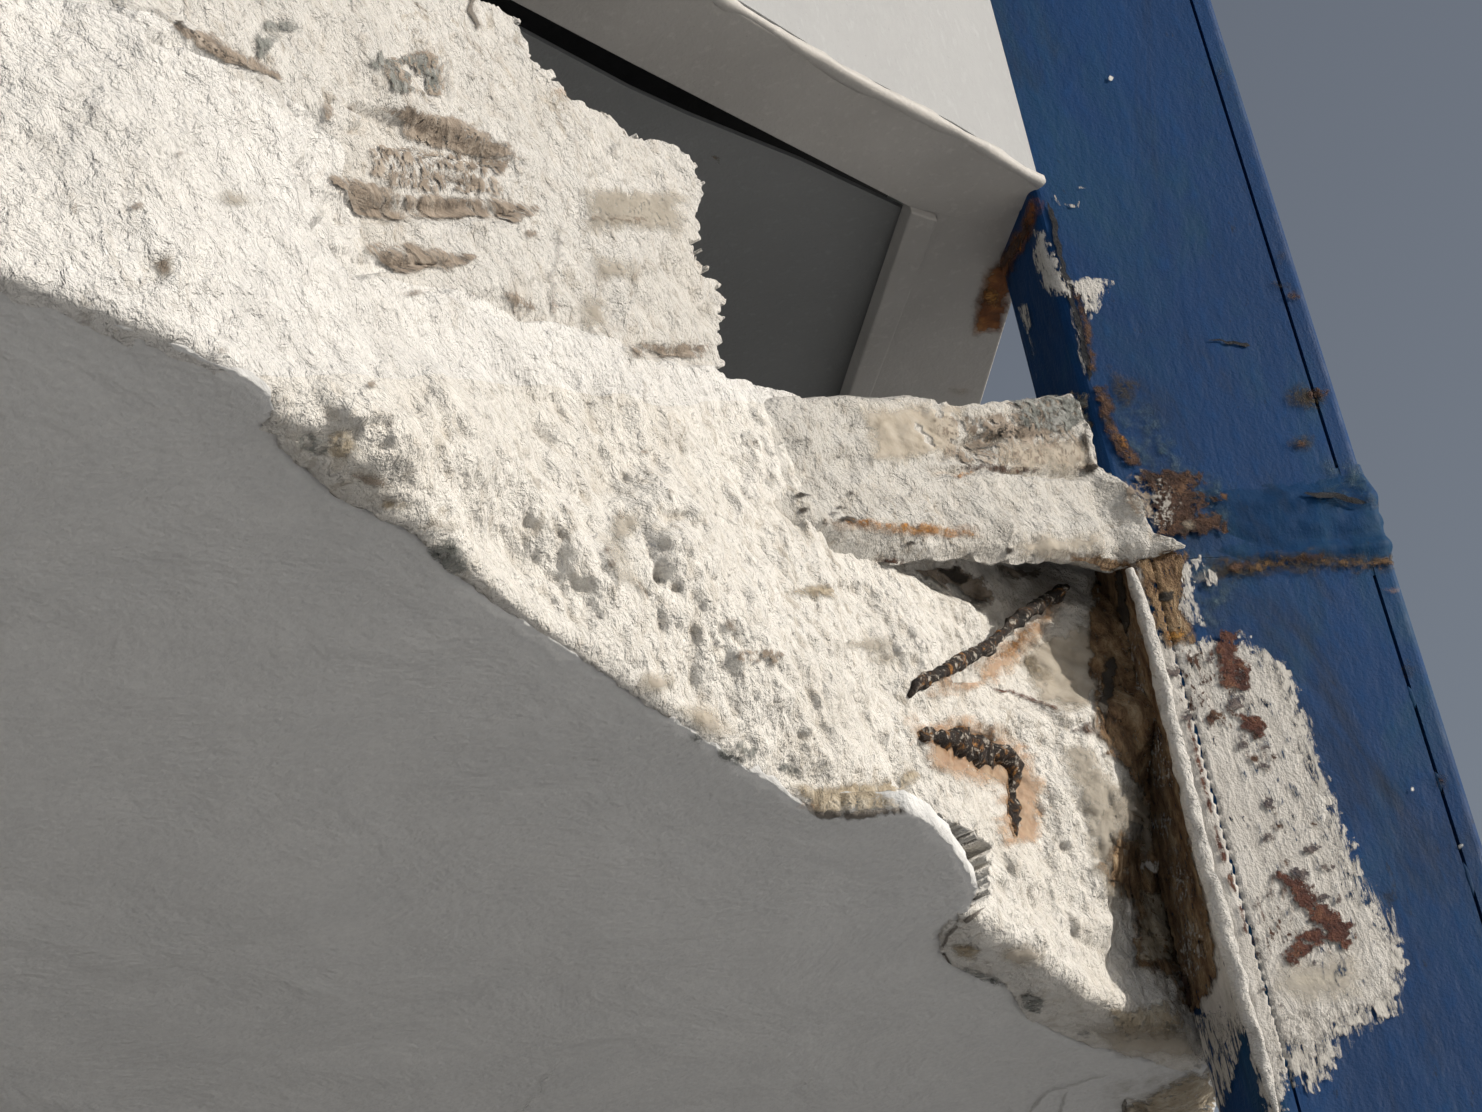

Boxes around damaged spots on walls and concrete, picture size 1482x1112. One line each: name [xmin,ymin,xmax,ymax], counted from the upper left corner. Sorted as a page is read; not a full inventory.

flaking render [112,0,726,369]
rust [975,201,1035,333]
peeling [1018,303,1031,334]
peeling [1033,229,1115,372]
rust [956,464,1037,478]
rust [1212,552,1394,579]
spalling [257,373,1410,1112]
rust [917,726,1025,838]
rust [907,584,1070,699]
rust [1056,378,1228,1013]